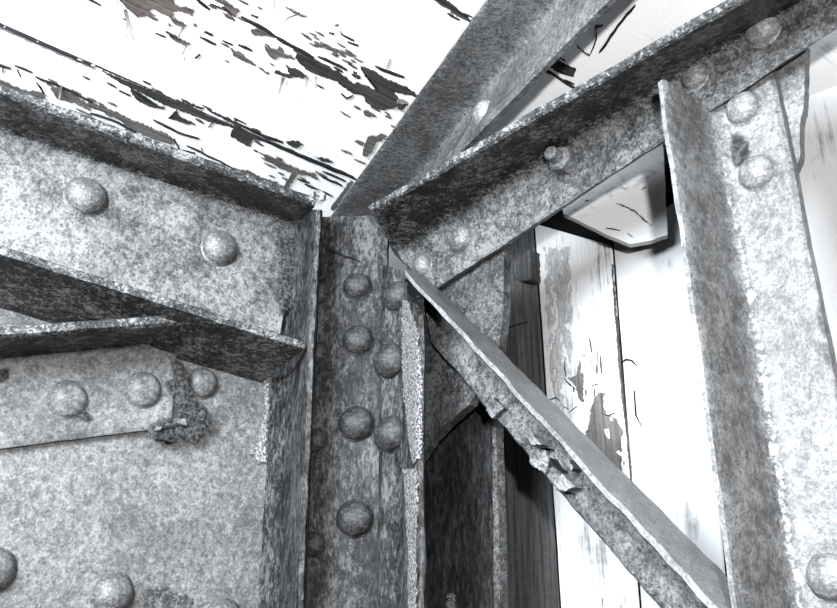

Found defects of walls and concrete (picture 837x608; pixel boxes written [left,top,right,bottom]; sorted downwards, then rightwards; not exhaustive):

peeling [435,0,473,22]
peeling [0,24,354,211]
peeling [116,0,417,164]
peeling [543,246,625,471]
rust [147,360,210,444]
rust [486,397,508,419]
rust [526,432,582,494]
rust [140,586,194,608]